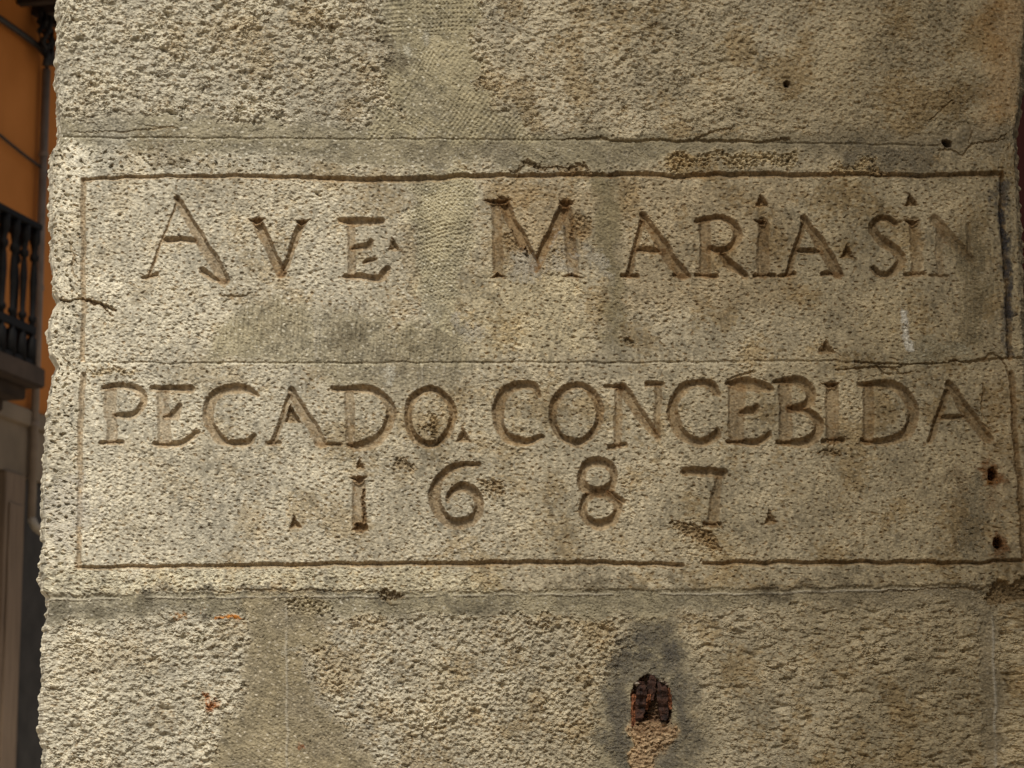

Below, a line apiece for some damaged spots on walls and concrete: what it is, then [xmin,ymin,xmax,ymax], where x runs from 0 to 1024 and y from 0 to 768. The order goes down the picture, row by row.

crack [60,243,117,316]
spalling [626,717,680,768]